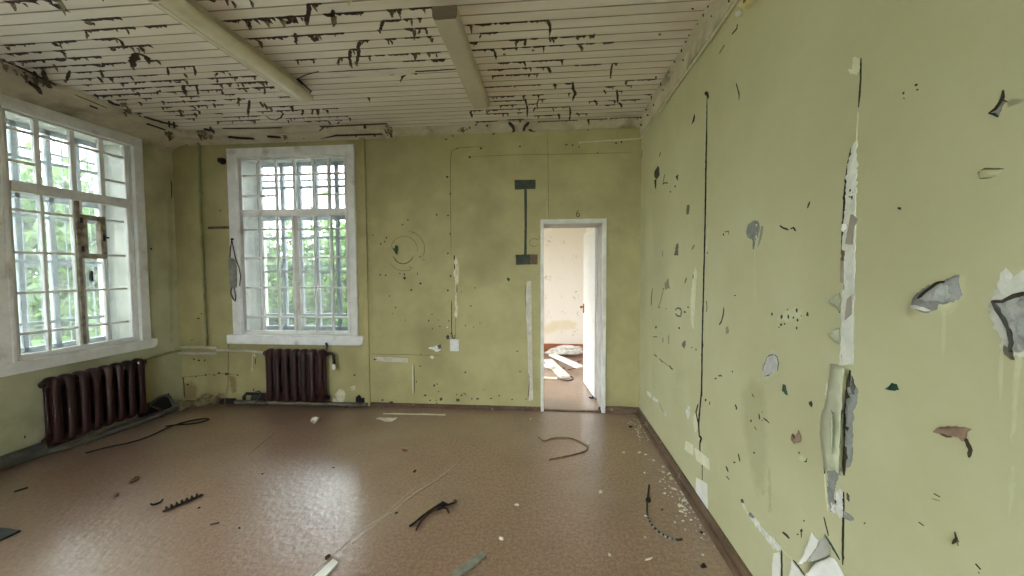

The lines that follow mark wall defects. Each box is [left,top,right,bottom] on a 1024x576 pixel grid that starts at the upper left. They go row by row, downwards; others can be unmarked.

peeling [4,0,70,16]
peeling [0,17,393,143]
peeling [209,0,364,49]
peeling [337,6,446,82]
peeling [458,19,690,133]
spalling [988,90,1024,117]
spalling [746,220,764,249]
crack [695,91,709,480]
peeling [809,140,865,524]
spalling [968,262,1024,363]
peeling [933,426,973,458]
peeling [740,499,844,576]